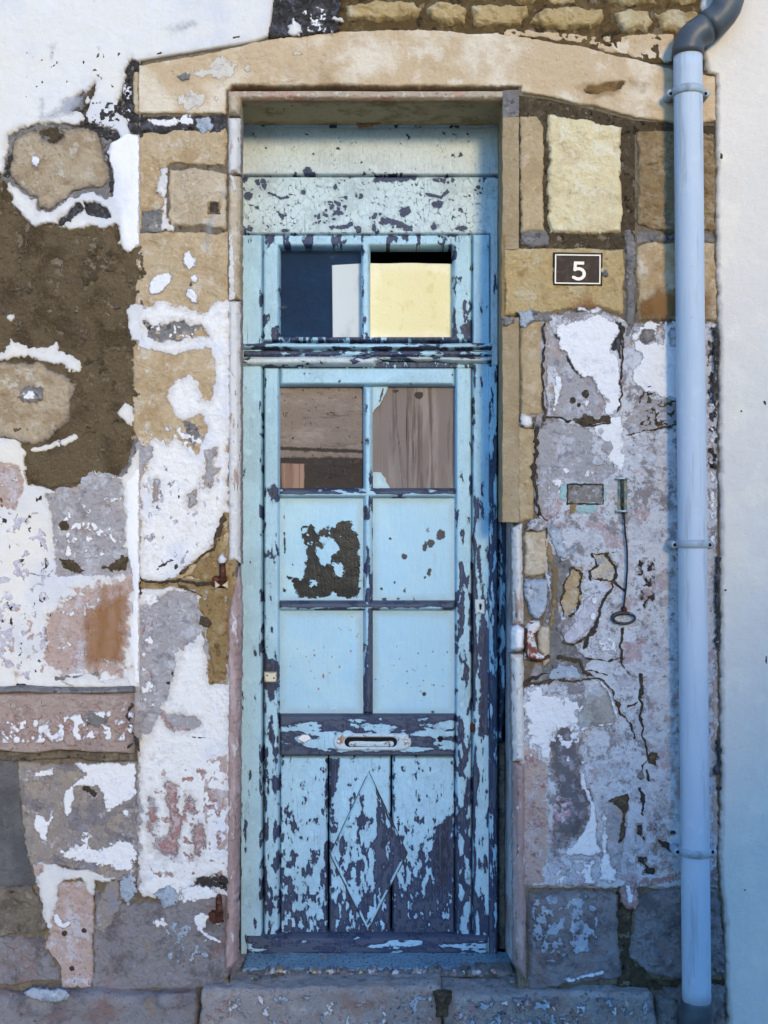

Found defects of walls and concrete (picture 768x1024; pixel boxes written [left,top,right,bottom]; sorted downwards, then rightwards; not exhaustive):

flaking render [0,53,250,746]
crack [523,579,649,772]
peeling [511,306,681,963]
peeling [148,754,229,964]
peeling [565,970,605,983]